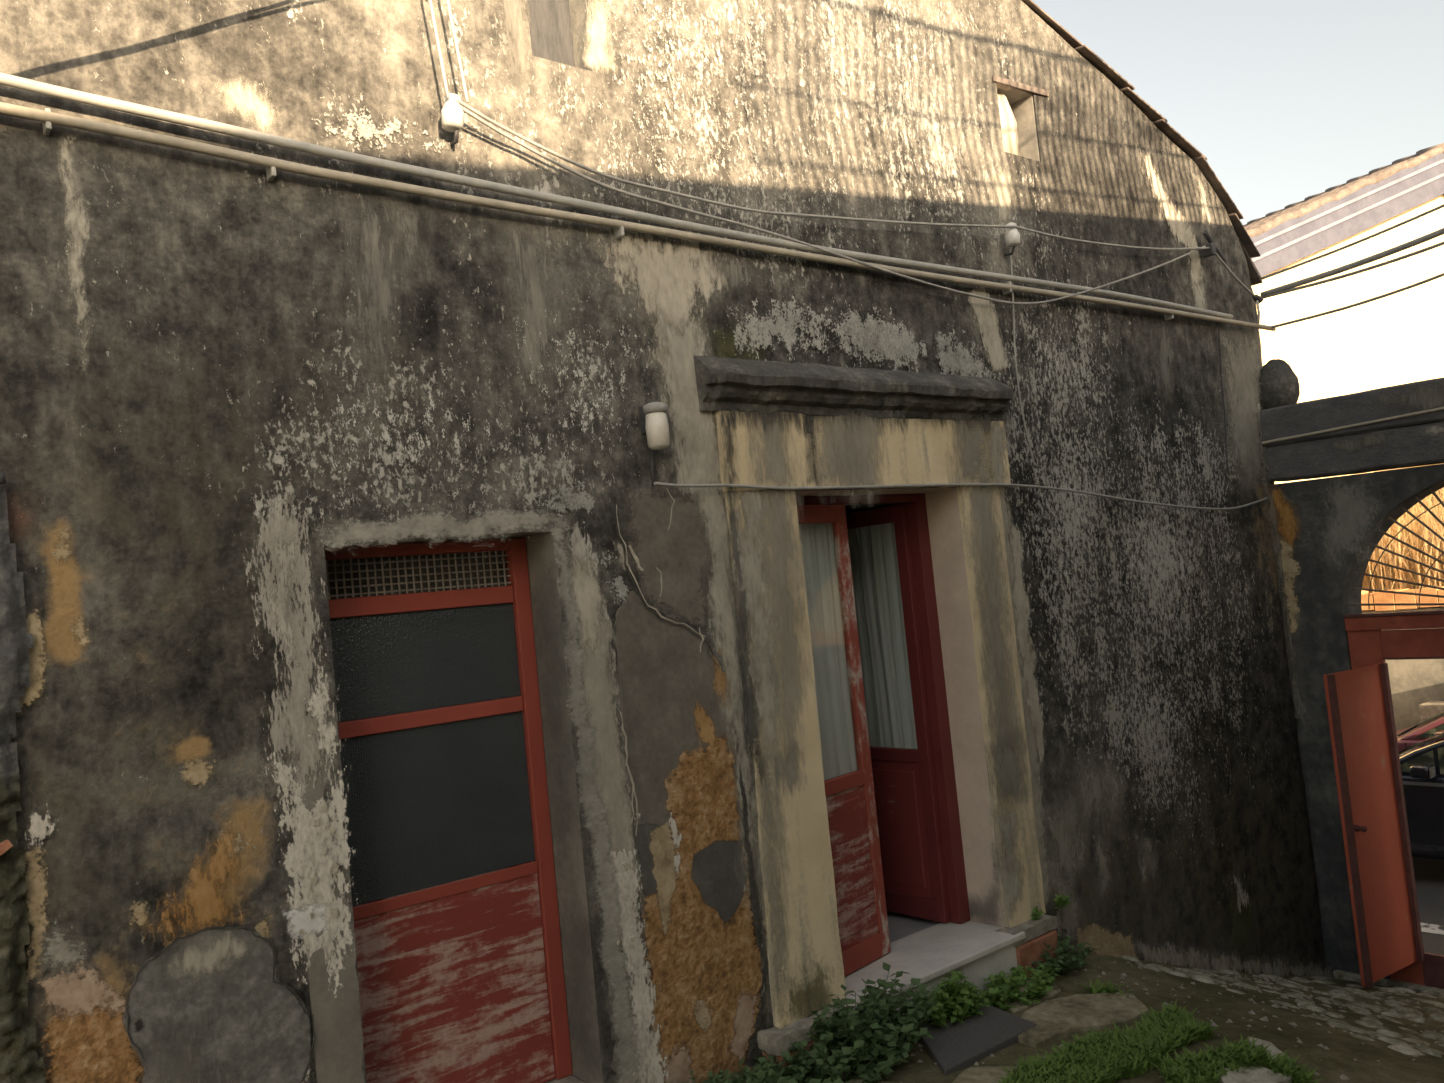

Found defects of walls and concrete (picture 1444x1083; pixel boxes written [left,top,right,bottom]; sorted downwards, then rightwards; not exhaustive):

damp [60,138,89,364]
damp [347,199,428,373]
damp [506,224,565,394]
flaking render [18,609,49,715]
flaking render [70,616,90,646]
flaking render [243,291,771,1083]
damp [597,230,1333,1017]
flaking render [24,801,144,1083]